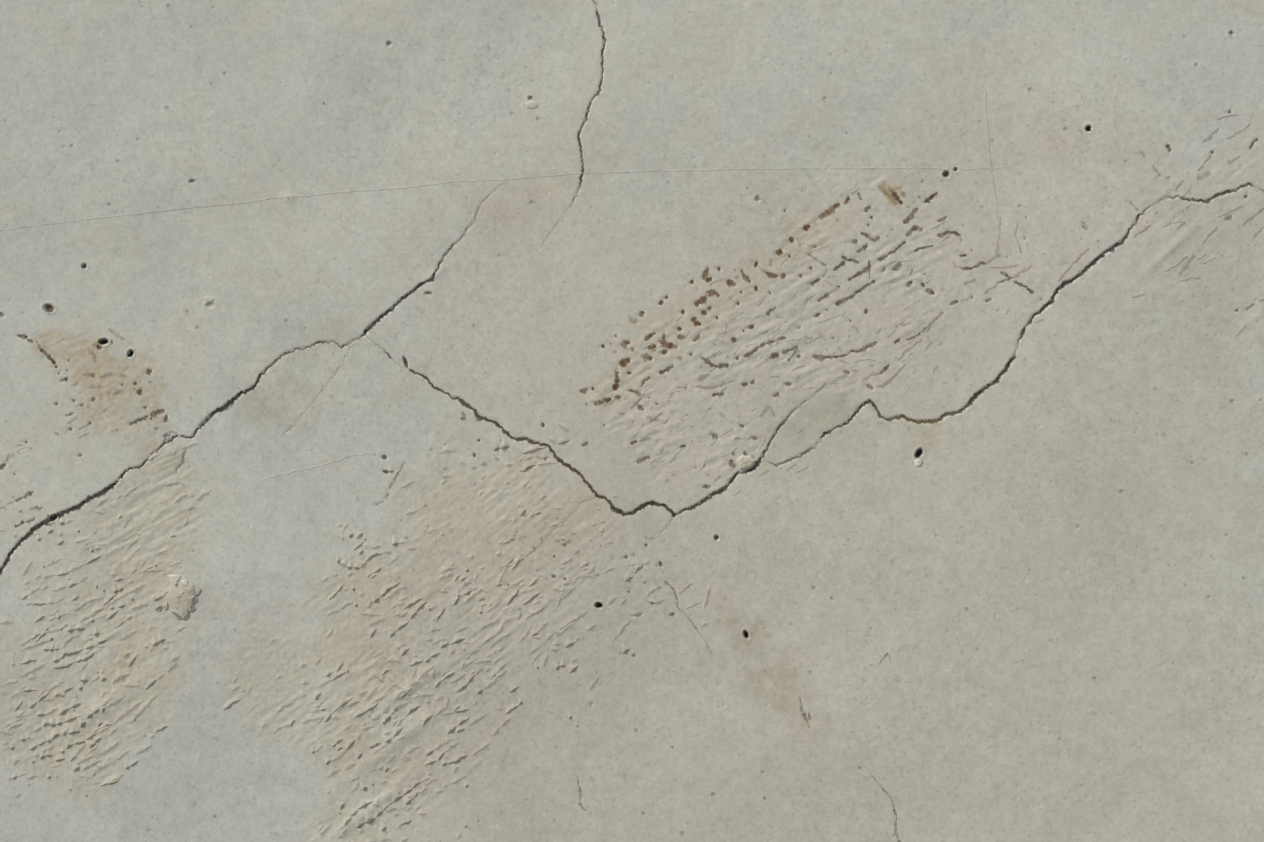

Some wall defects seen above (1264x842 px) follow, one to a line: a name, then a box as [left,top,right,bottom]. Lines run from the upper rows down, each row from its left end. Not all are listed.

peeling [0,157,1043,842]
crack [0,0,1264,576]
crack [664,580,712,654]
rust [579,178,906,417]